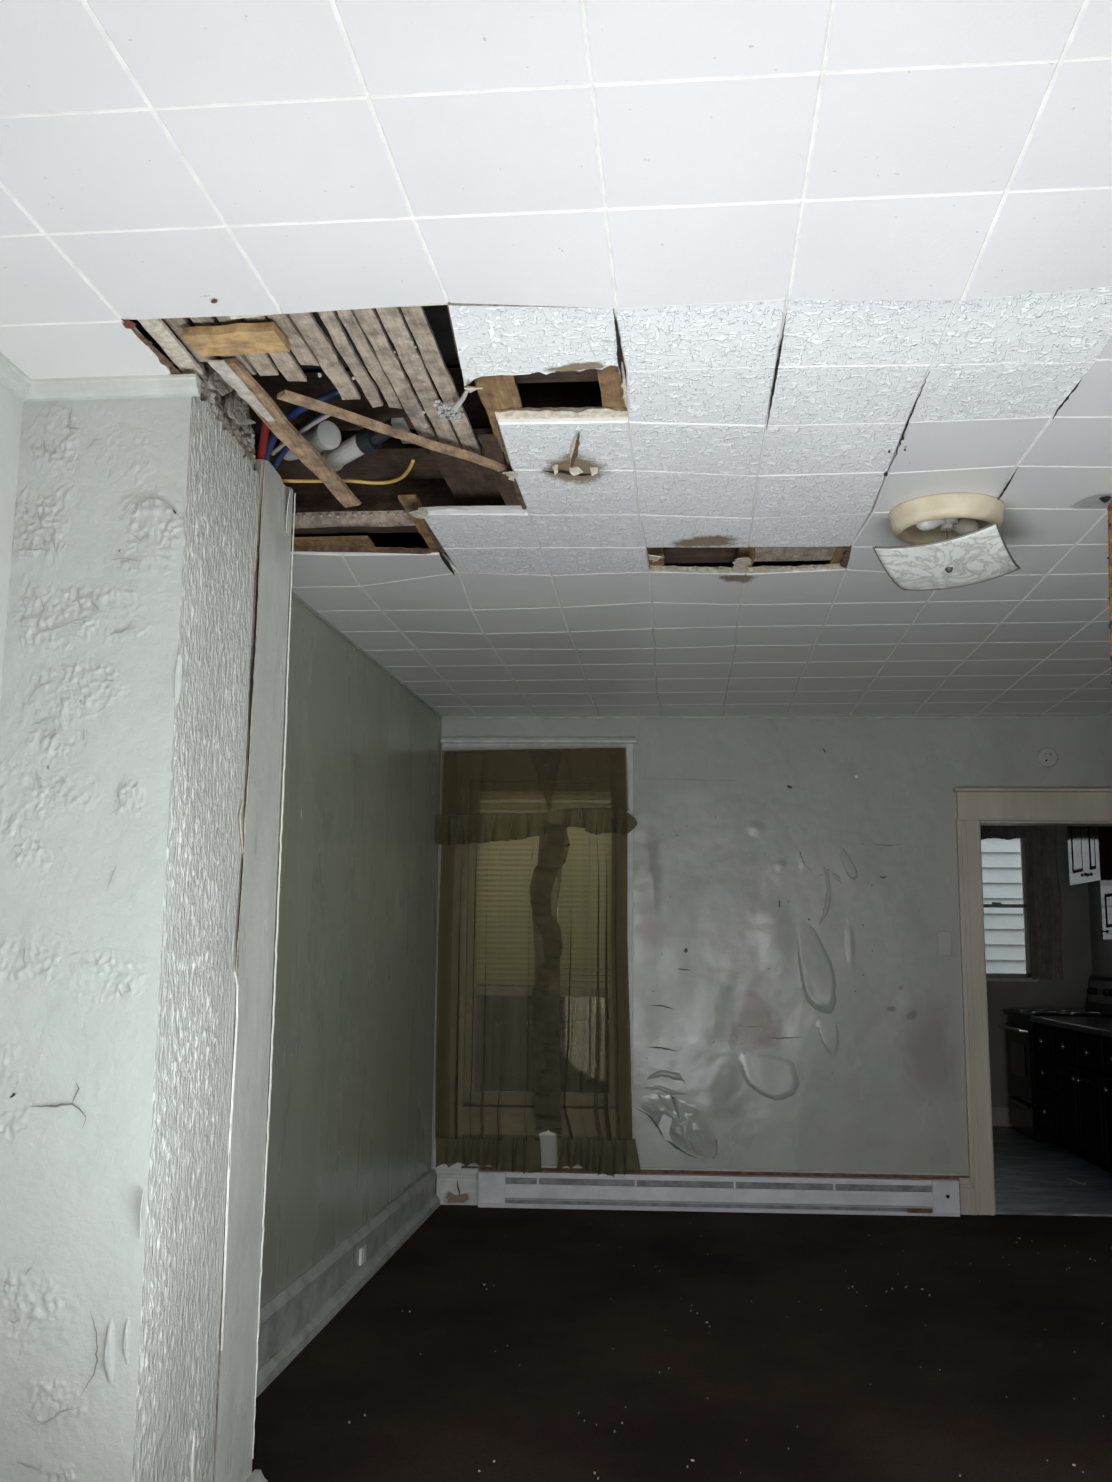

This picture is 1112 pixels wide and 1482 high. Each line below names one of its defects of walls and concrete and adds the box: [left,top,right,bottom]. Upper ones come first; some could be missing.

flaking render [182,342,256,468]
crack [1053,376,1084,419]
crack [884,371,930,476]
peeling [552,465,599,476]
crack [998,469,1017,500]
peeling [409,509,430,519]
peeling [731,558,752,571]